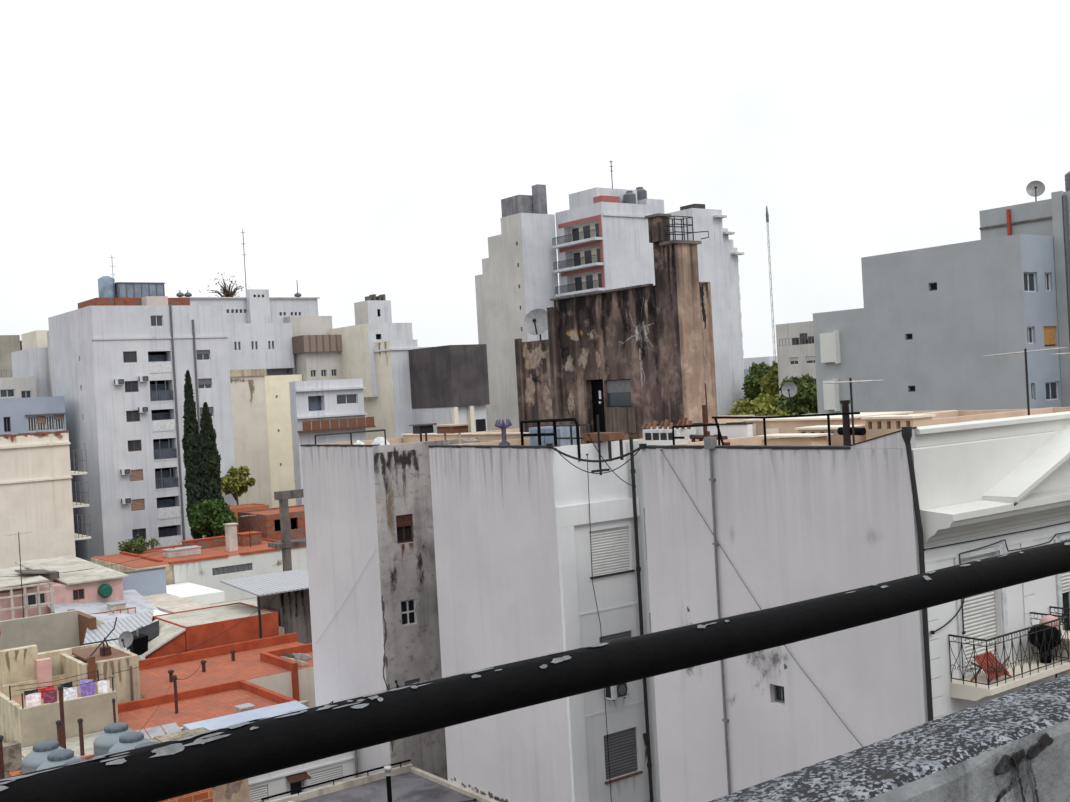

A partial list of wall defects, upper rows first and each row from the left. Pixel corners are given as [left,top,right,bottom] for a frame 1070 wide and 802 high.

flaking render [561,329,603,371]
water stain [558,286,658,386]
flaking render [522,342,553,419]
water stain [374,448,419,528]
peeling [149,595,435,758]
peeling [540,651,571,669]
peeling [0,752,130,791]
peeling [451,777,508,802]
crack [997,752,1039,802]